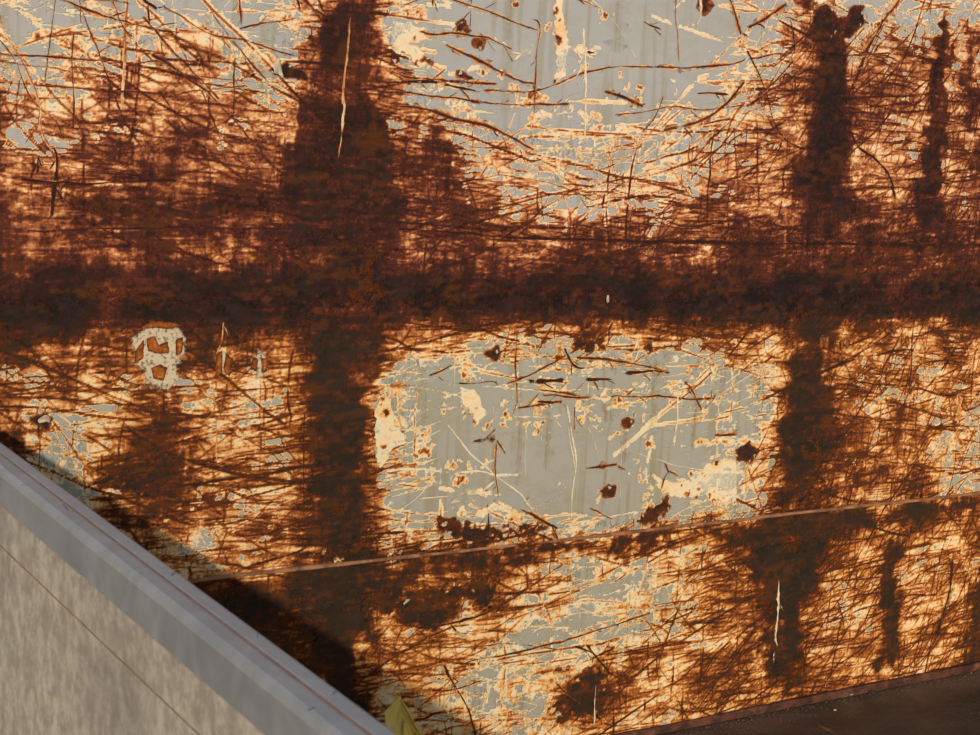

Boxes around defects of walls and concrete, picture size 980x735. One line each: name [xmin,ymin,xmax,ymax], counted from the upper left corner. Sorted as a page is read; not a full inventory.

peeling [455,0,487,51]
peeling [799,0,865,51]
corrosion [314,291,348,323]
corrosion [353,290,381,314]
corrosion [422,294,434,311]
corrosion [146,336,169,354]
corrosion [151,364,167,381]
peeling [529,324,615,406]
peeling [735,440,760,465]
peeling [429,497,549,548]
peeling [634,495,671,529]
corrosion [192,579,235,608]